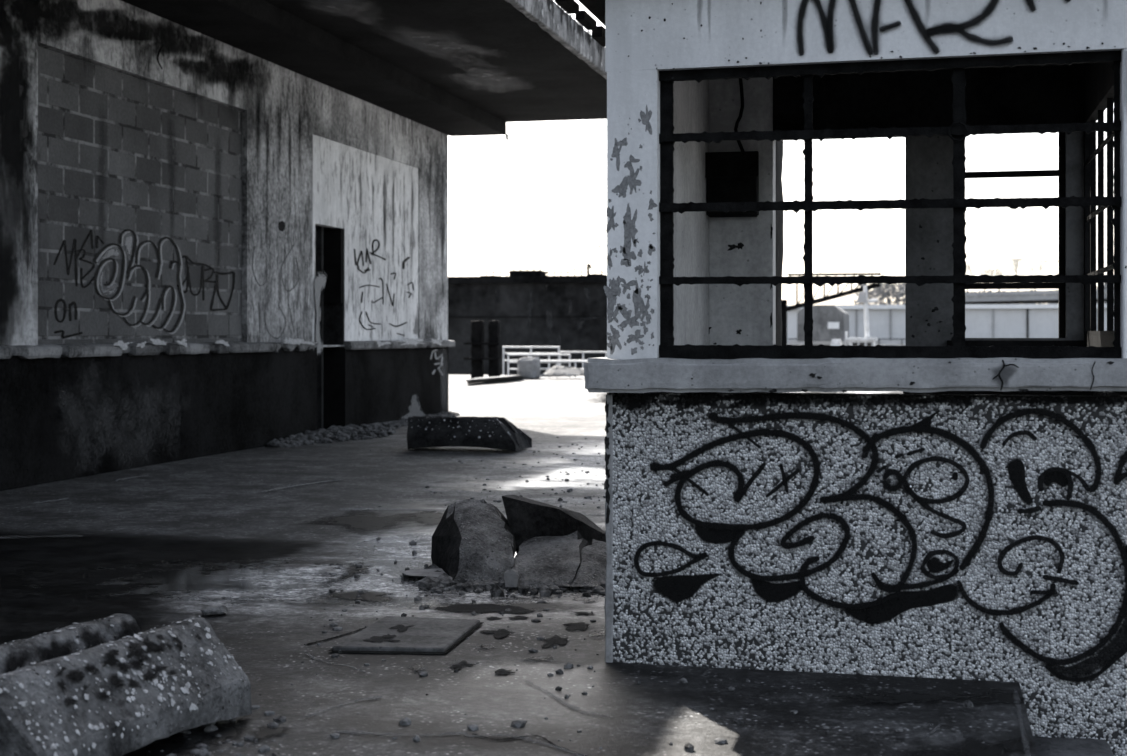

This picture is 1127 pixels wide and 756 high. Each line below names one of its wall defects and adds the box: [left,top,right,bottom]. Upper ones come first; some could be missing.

peeling [0,0,256,185]
leakage [229,65,301,174]
leakage [403,33,518,89]
peeling [603,105,657,355]